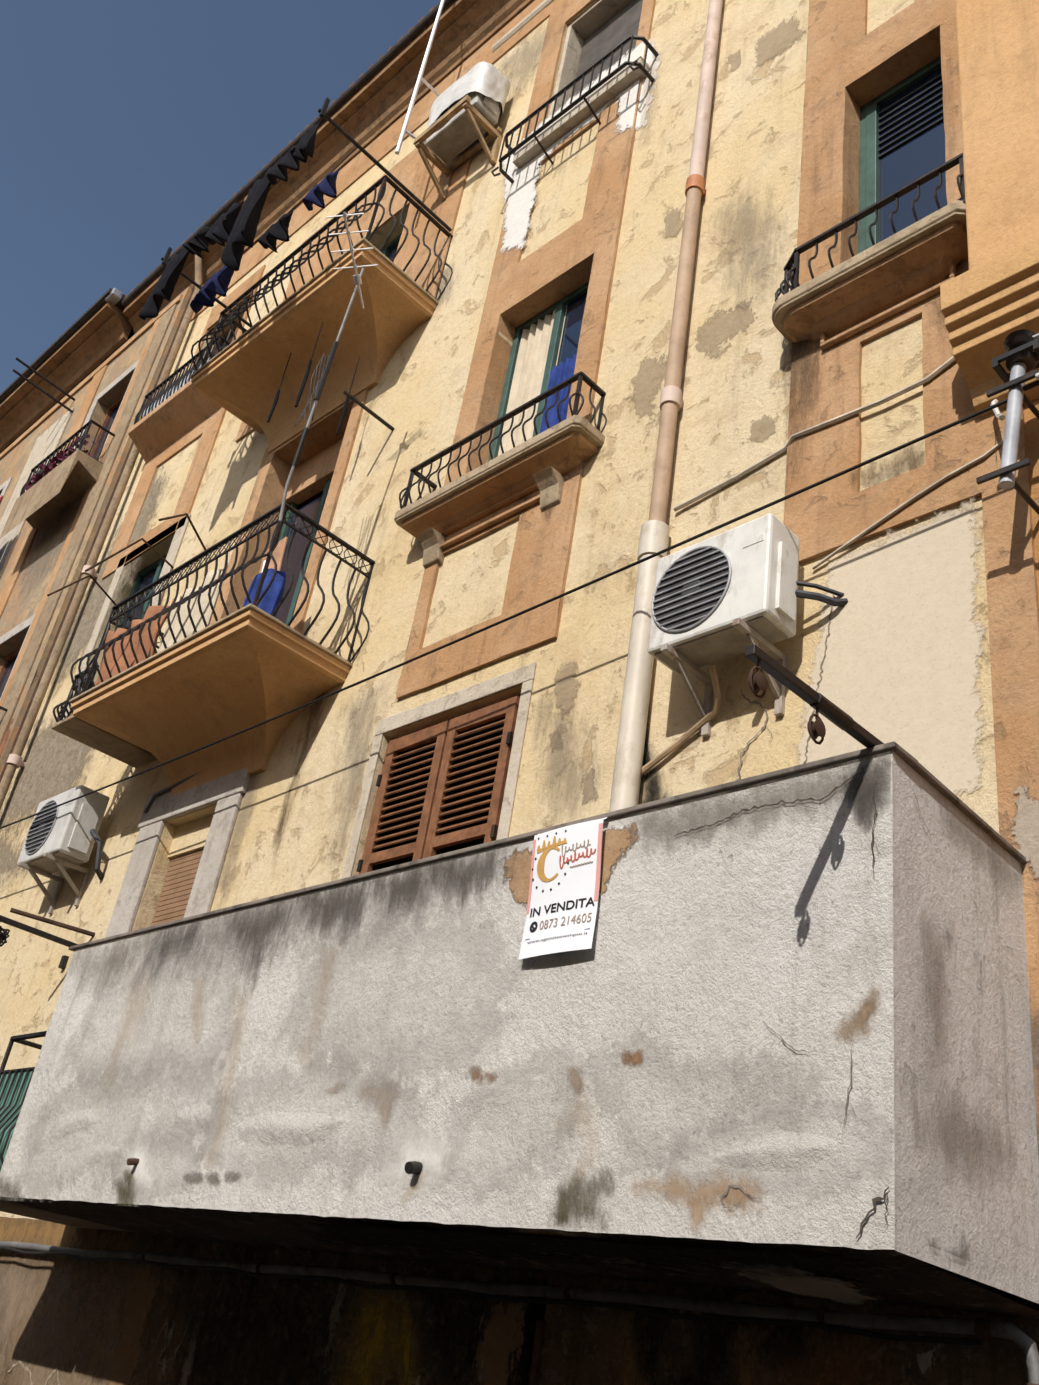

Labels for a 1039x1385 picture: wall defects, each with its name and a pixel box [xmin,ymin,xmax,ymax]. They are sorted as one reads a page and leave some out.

peeling [727,12,806,71]
peeling [695,296,757,359]
crack [803,595,835,764]
crack [674,690,882,879]
damp [159,924,197,965]
damp [238,853,493,981]
spalling [498,847,532,911]
spalling [598,822,639,900]
peeling [1009,778,1039,882]
crack [762,1019,871,1133]
damp [558,1175,612,1222]
crack [856,1187,889,1238]